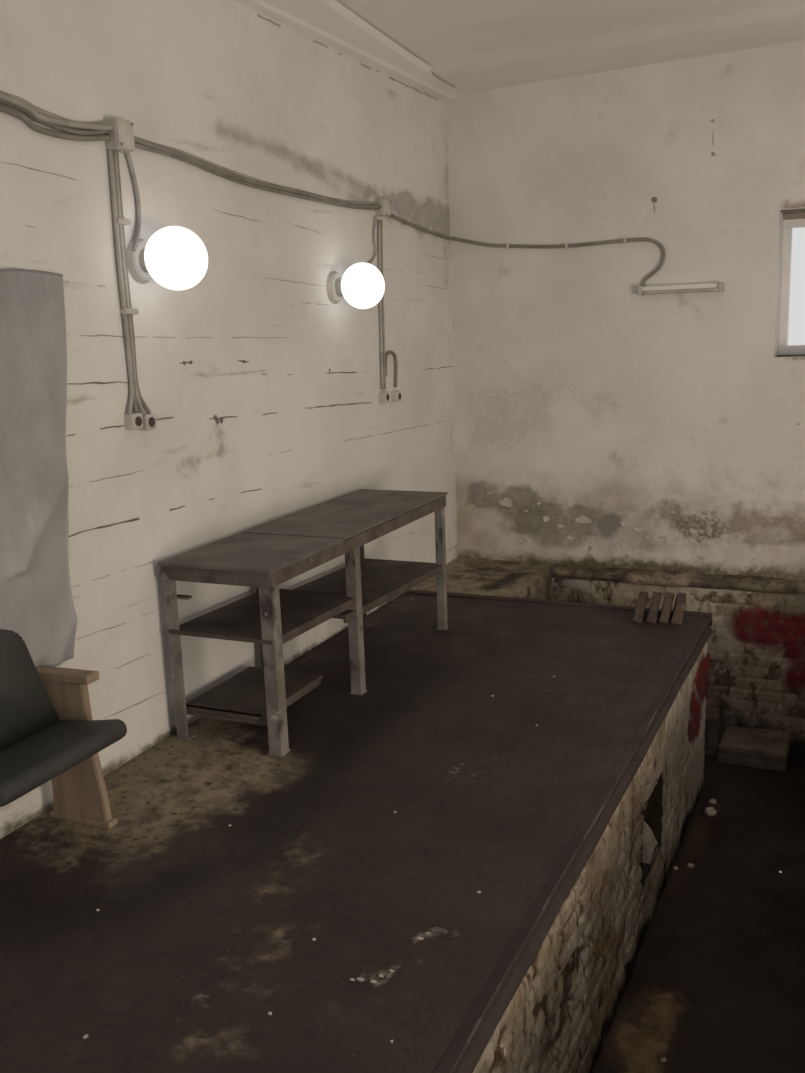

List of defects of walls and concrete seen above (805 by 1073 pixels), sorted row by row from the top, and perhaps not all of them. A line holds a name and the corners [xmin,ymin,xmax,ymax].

peeling [487,491,592,540]
leakage [469,484,621,566]
leakage [661,502,805,542]
leakage [620,560,716,572]
spalling [473,578,805,1073]